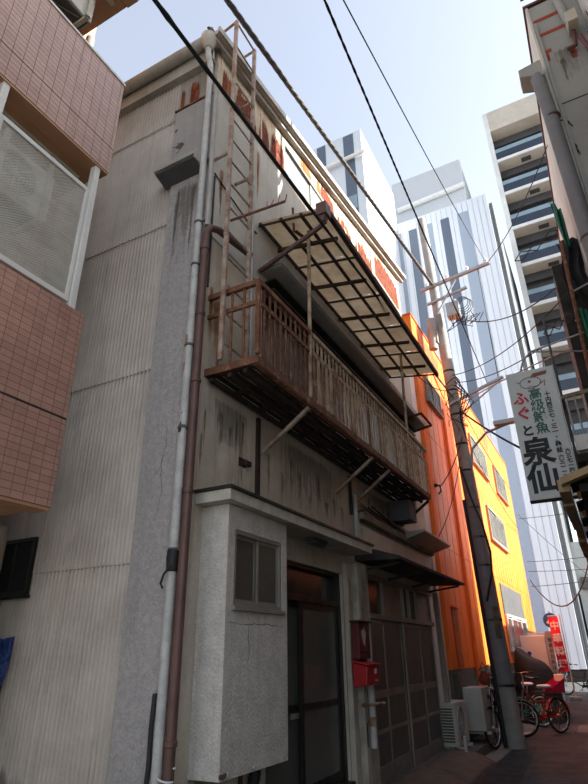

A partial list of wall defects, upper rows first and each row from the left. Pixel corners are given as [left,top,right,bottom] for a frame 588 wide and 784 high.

corrosion [180,82,199,108]
corrosion [222,71,284,169]